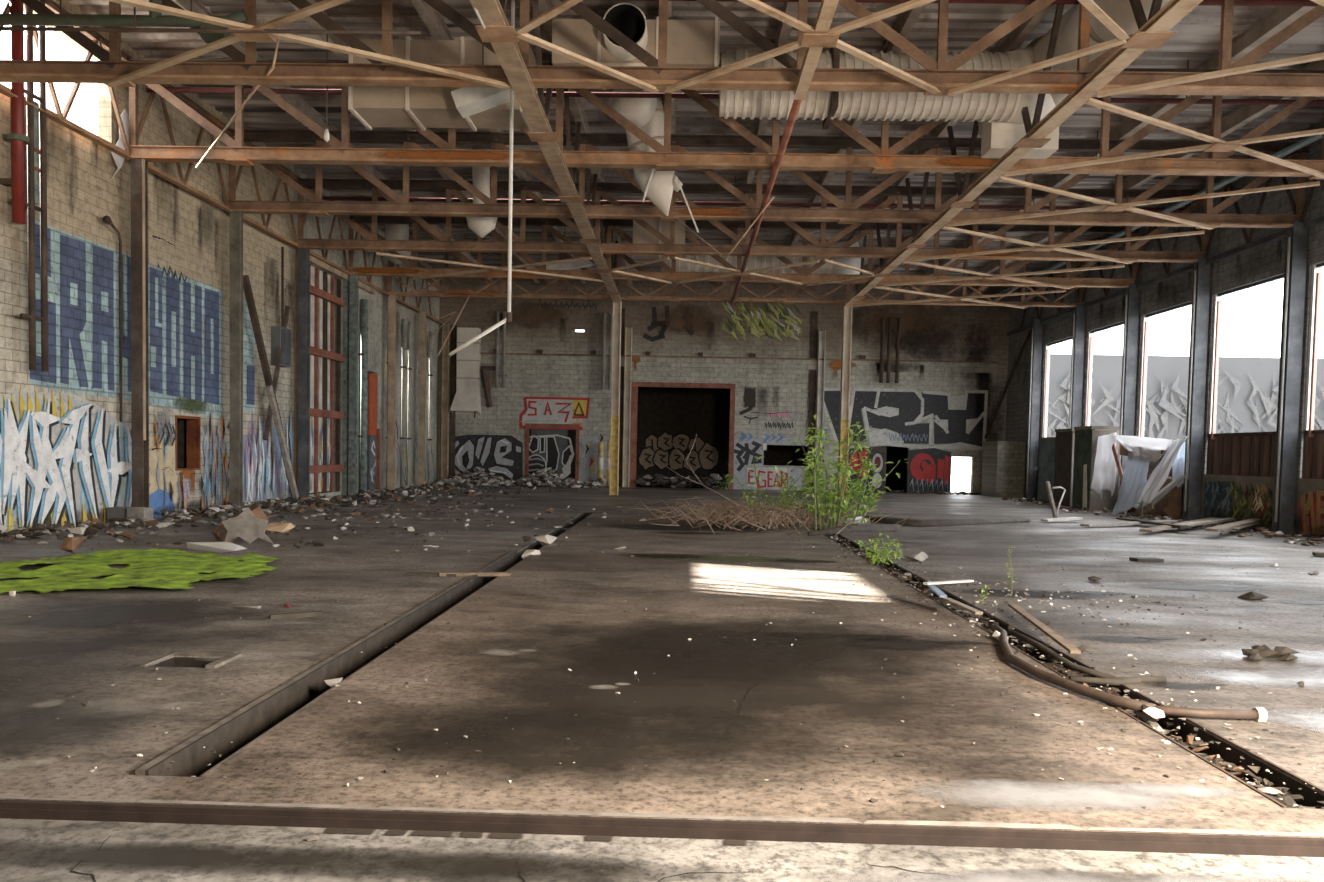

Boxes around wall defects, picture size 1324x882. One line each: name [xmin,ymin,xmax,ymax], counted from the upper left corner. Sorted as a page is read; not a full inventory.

damp [399,624,959,775]